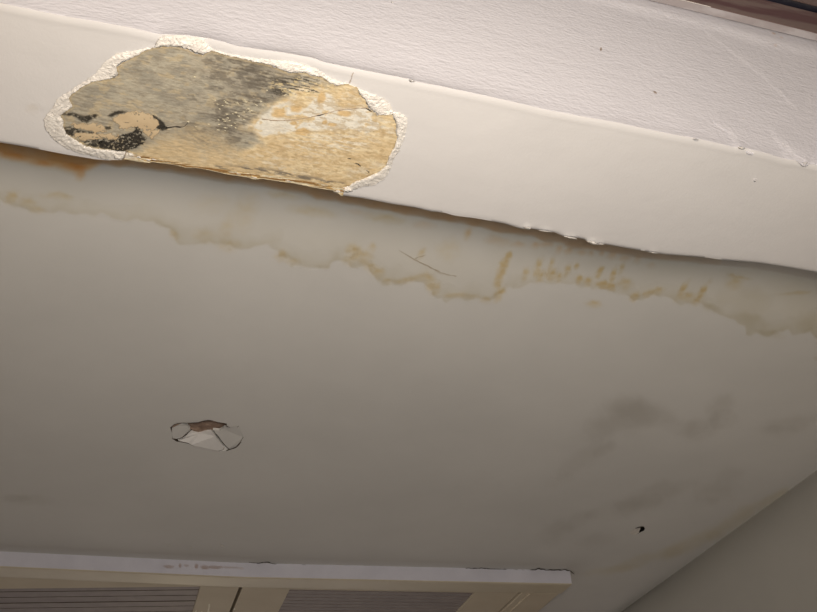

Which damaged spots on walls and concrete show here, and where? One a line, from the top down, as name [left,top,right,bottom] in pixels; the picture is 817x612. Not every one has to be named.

spalling [44,35,408,196]